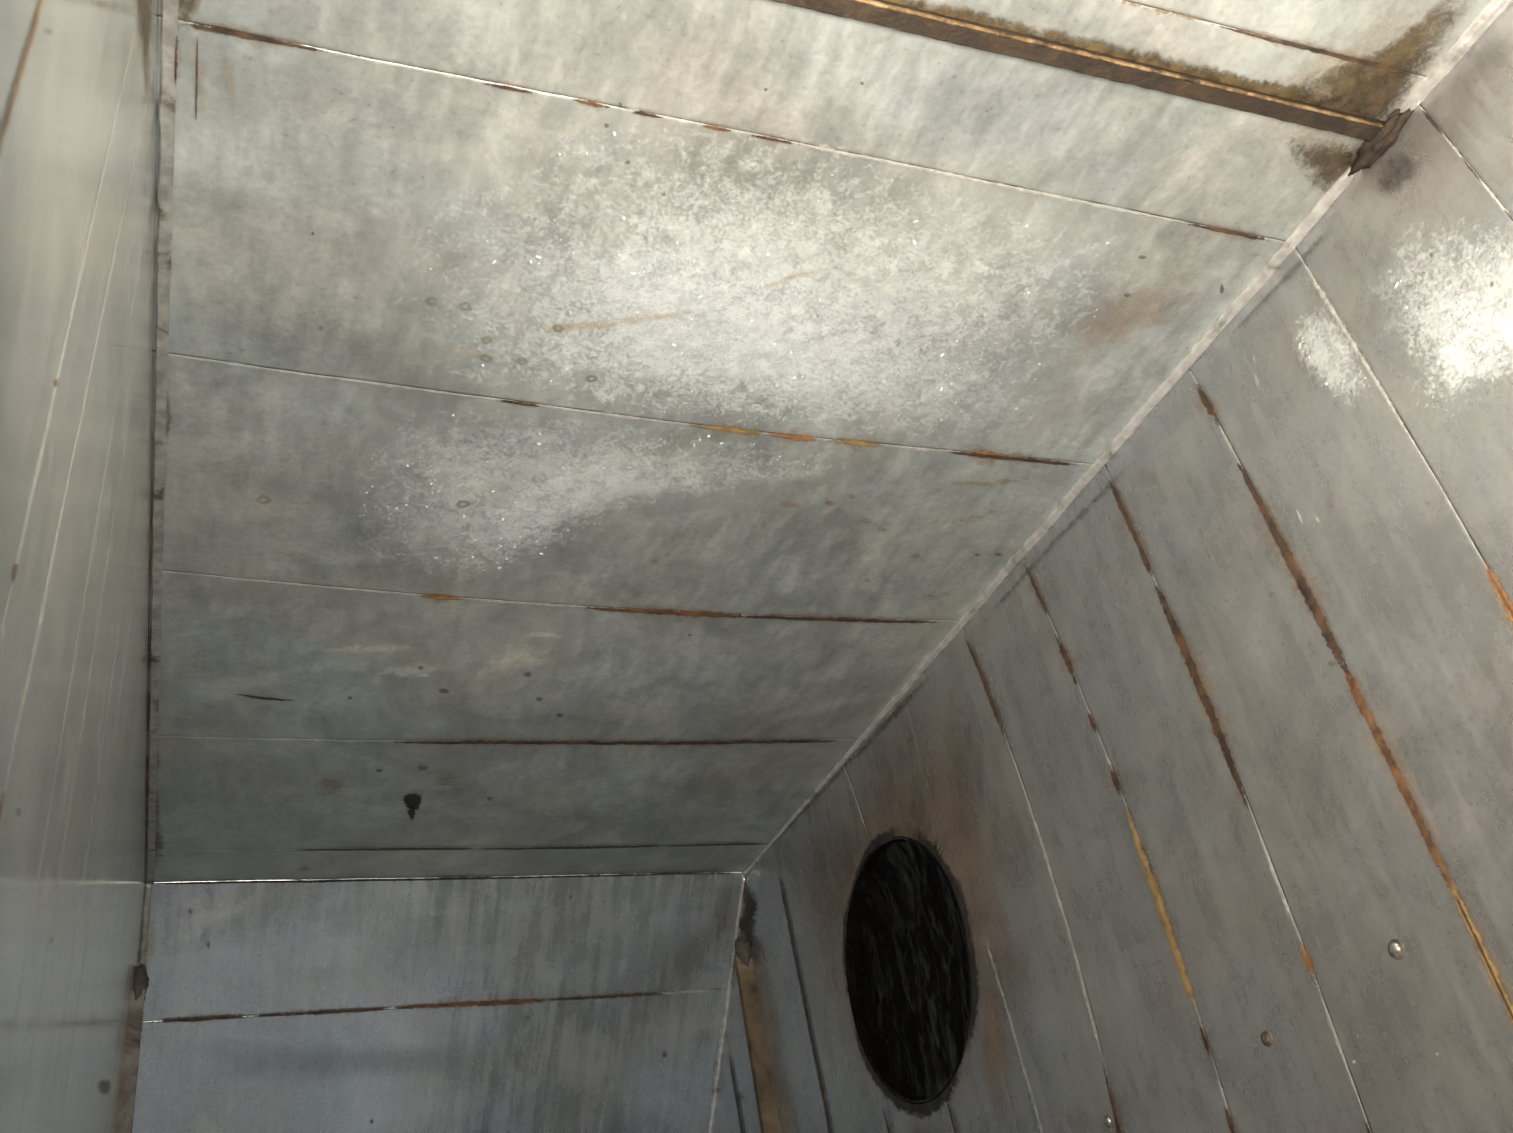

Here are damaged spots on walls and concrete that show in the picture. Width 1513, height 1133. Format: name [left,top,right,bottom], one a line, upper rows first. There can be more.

corrosion [1122,0,1404,73]
corrosion [0,0,44,154]
corrosion [485,83,532,93]
corrosion [575,99,610,108]
corrosion [1196,384,1219,424]
corrosion [691,424,880,447]
corrosion [949,451,1075,465]
corrosion [587,607,933,623]
corrosion [1108,480,1248,808]
corrosion [1237,464,1513,1023]
corrosion [1109,766,1195,1003]
corrosion [159,993,663,1023]